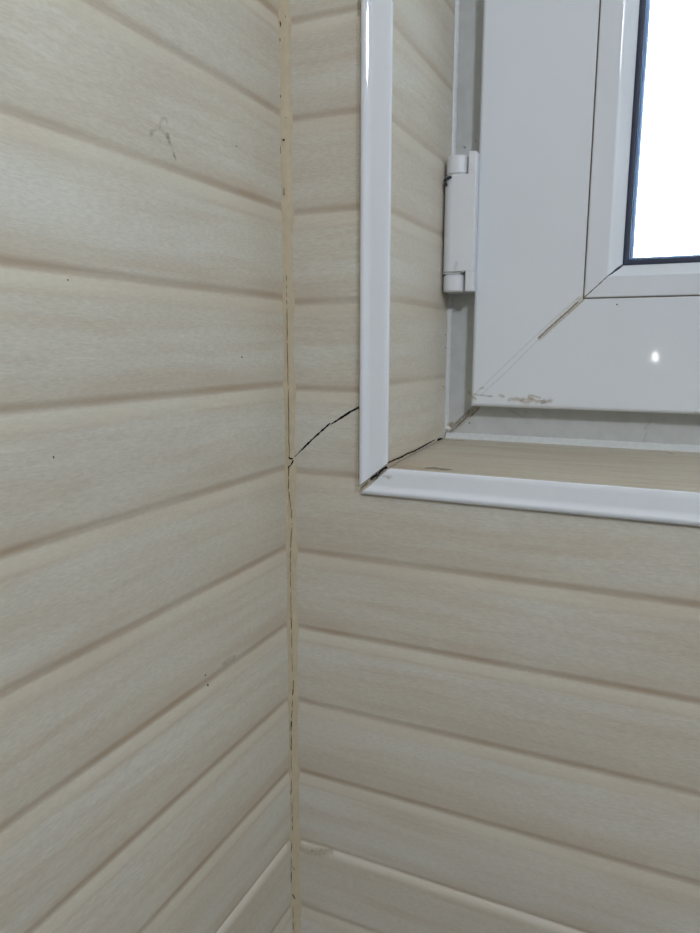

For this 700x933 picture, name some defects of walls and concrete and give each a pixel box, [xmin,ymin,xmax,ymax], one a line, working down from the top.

crack [388,438,462,465]